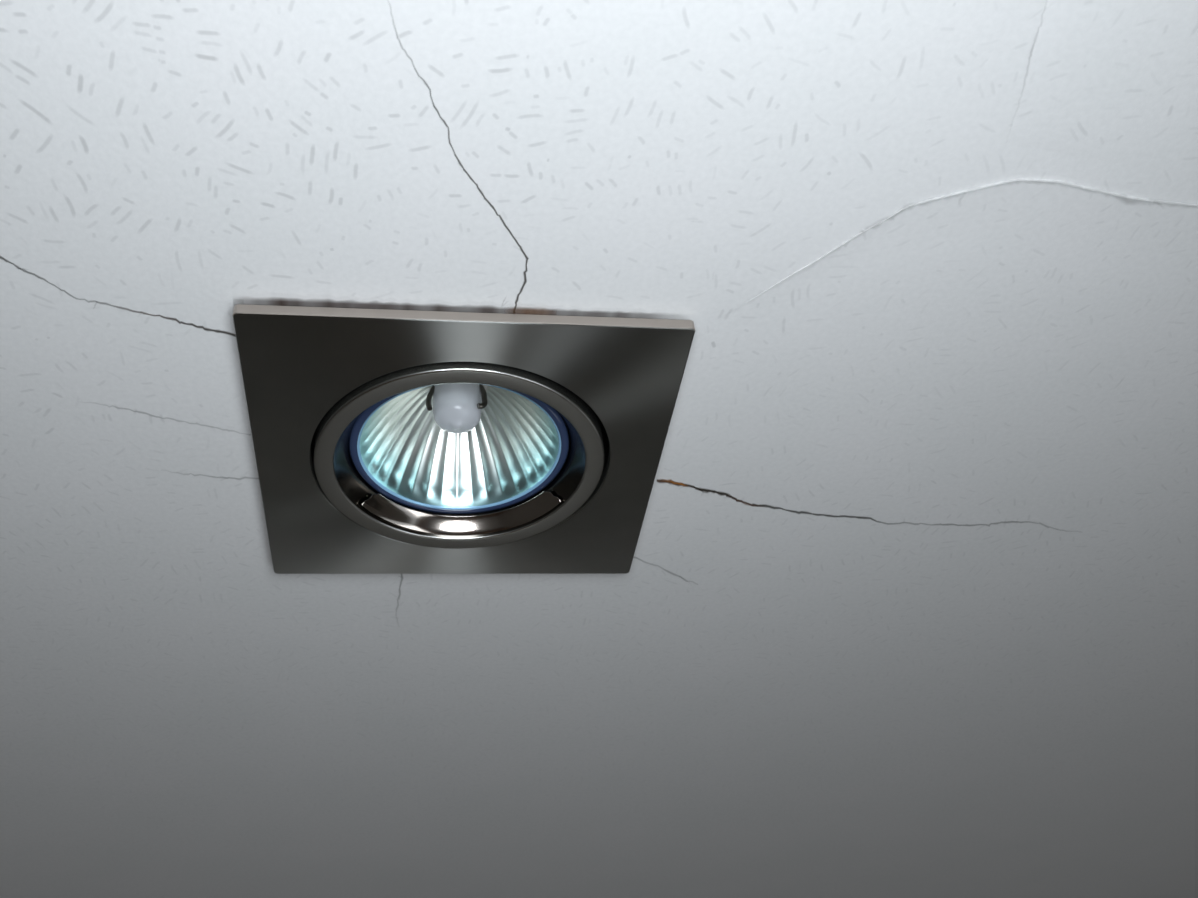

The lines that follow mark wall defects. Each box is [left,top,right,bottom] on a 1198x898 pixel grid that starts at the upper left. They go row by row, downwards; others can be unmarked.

crack [424,81,528,309]
crack [123,308,236,336]
crack [657,480,878,522]